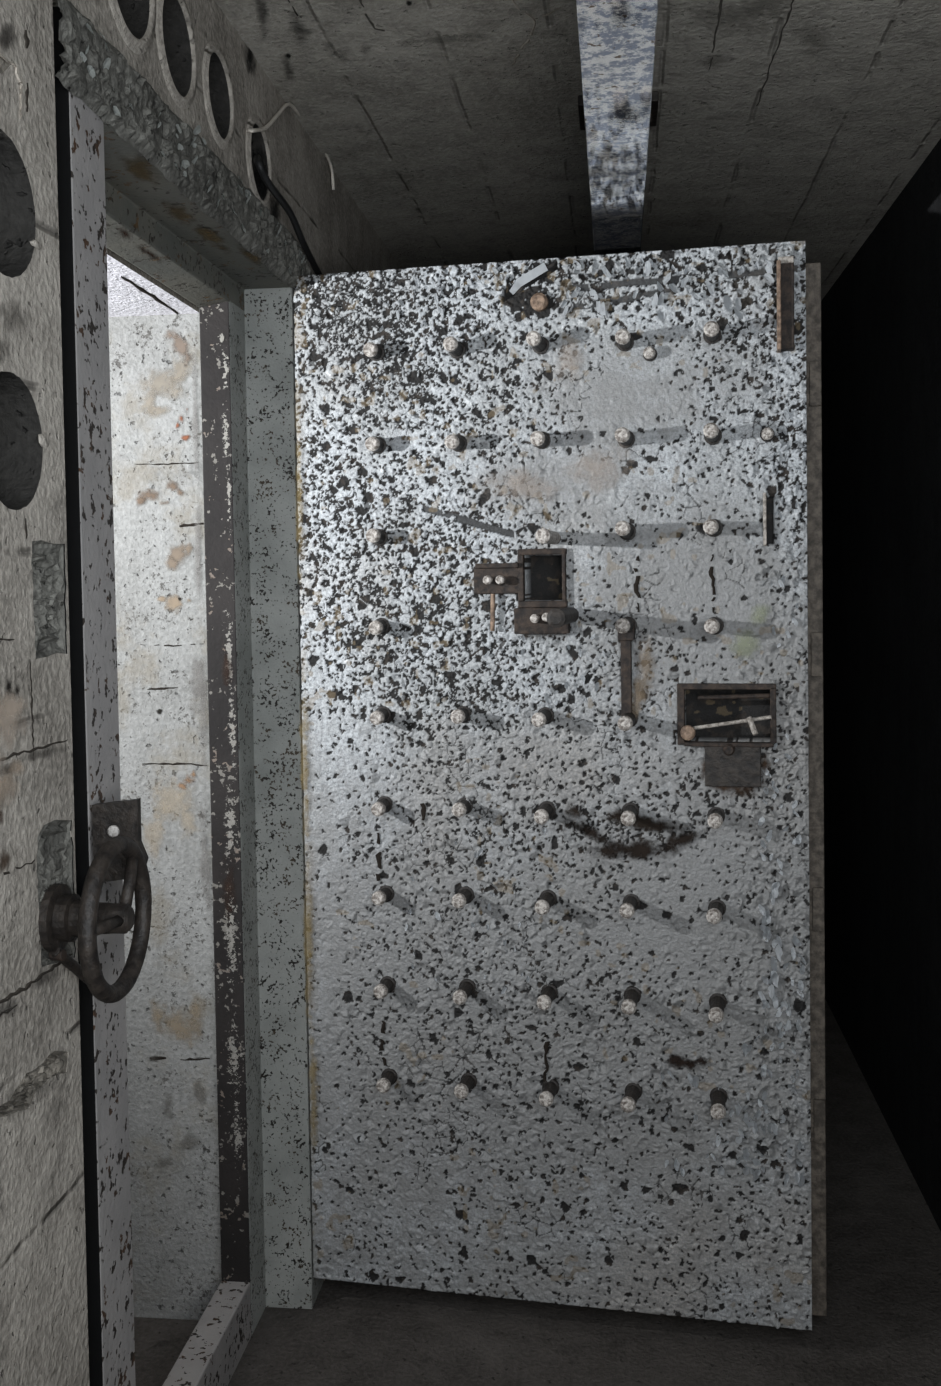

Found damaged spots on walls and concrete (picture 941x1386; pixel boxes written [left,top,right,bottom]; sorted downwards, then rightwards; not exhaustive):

peeling [218,328,232,535]
peeling [223,610,240,992]
peeling [227,1014,244,1164]